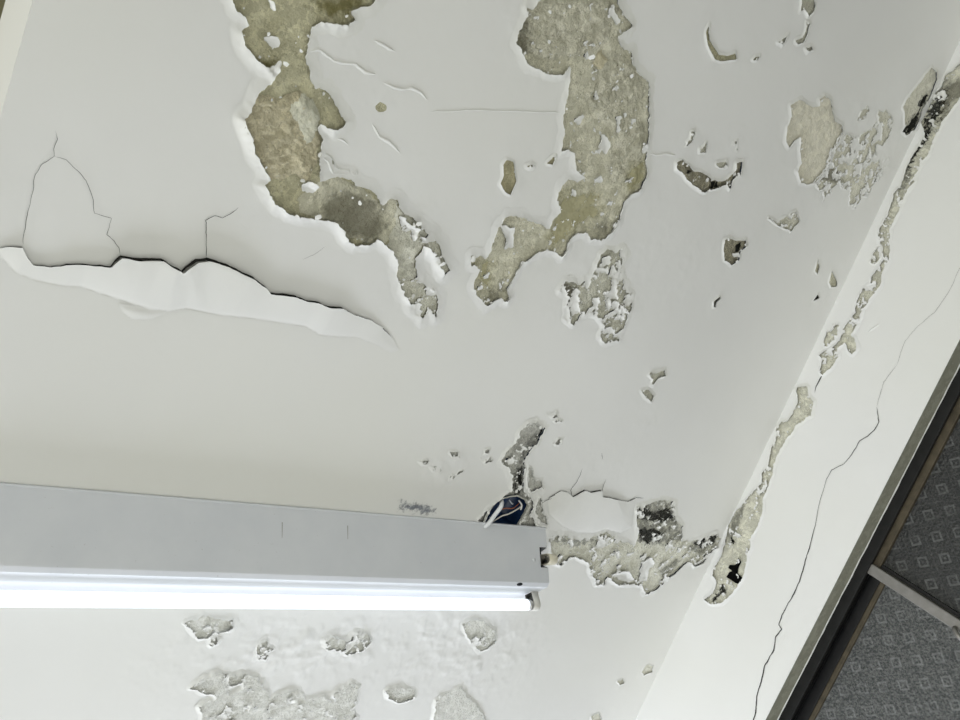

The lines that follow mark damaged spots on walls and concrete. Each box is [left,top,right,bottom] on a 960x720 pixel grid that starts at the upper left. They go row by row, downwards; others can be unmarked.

peeling [218,0,656,349]
spalling [673,128,745,196]
crack [3,135,389,334]
spalling [721,235,749,269]
peeling [782,60,960,379]
peeling [474,383,817,608]
crack [753,268,960,720]
peeling [181,611,242,650]
peeling [185,635,364,720]
peeling [320,624,373,657]
peeling [383,682,418,705]
peeling [460,616,499,656]